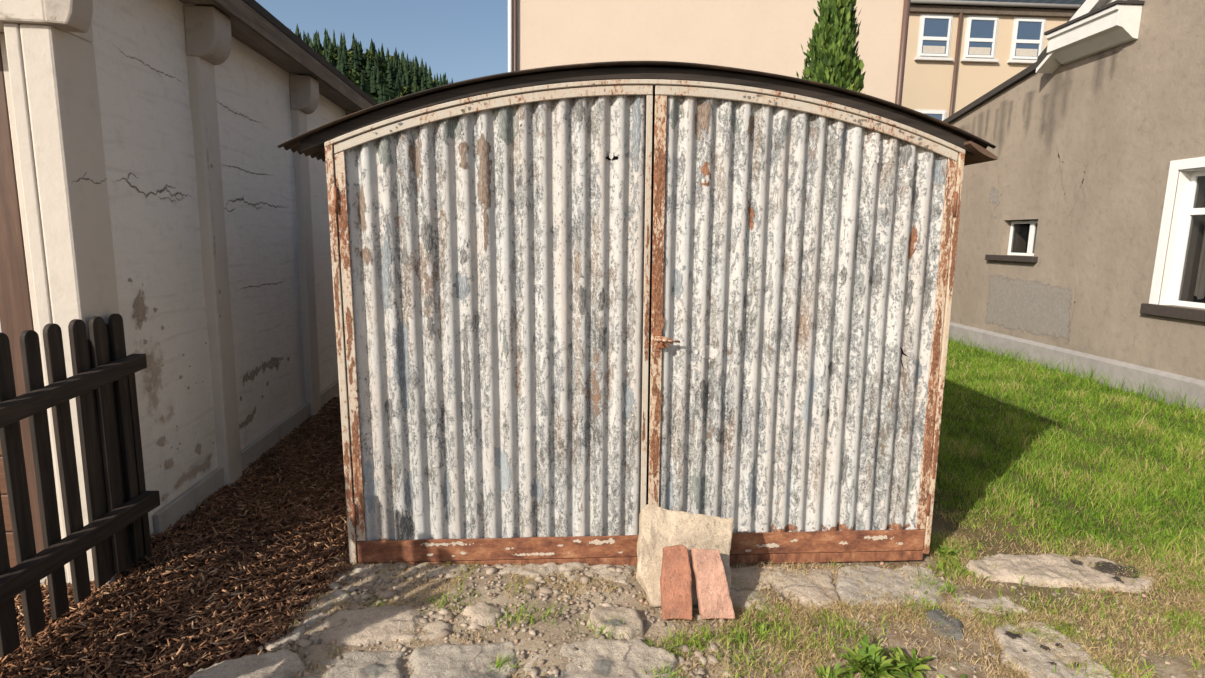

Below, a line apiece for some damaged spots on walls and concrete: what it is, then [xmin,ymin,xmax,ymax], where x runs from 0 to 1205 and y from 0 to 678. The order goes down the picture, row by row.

crack [115,46,186,85]
peeling [728,94,791,143]
crack [72,172,195,202]
crack [221,164,285,212]
peeling [443,102,521,253]
rust [942,186,961,292]
peeling [349,185,410,429]
rust [642,149,665,502]
peeling [796,360,836,440]
rust [921,306,942,506]
peeling [399,472,474,557]
rust [762,522,856,532]